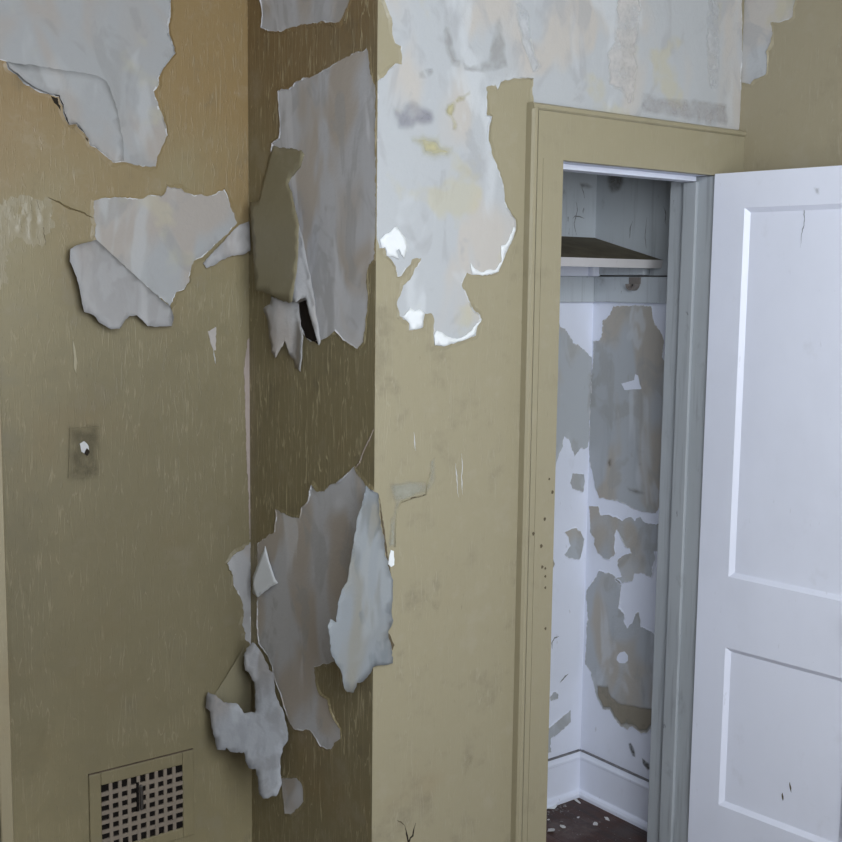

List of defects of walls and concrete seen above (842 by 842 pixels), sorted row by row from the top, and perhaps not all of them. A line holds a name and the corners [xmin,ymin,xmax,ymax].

peeling [0,0,176,171]
peeling [70,0,798,371]
peeling [281,774,306,818]
peeling [225,465,374,751]
peeling [548,709,572,754]
peeling [556,303,665,735]